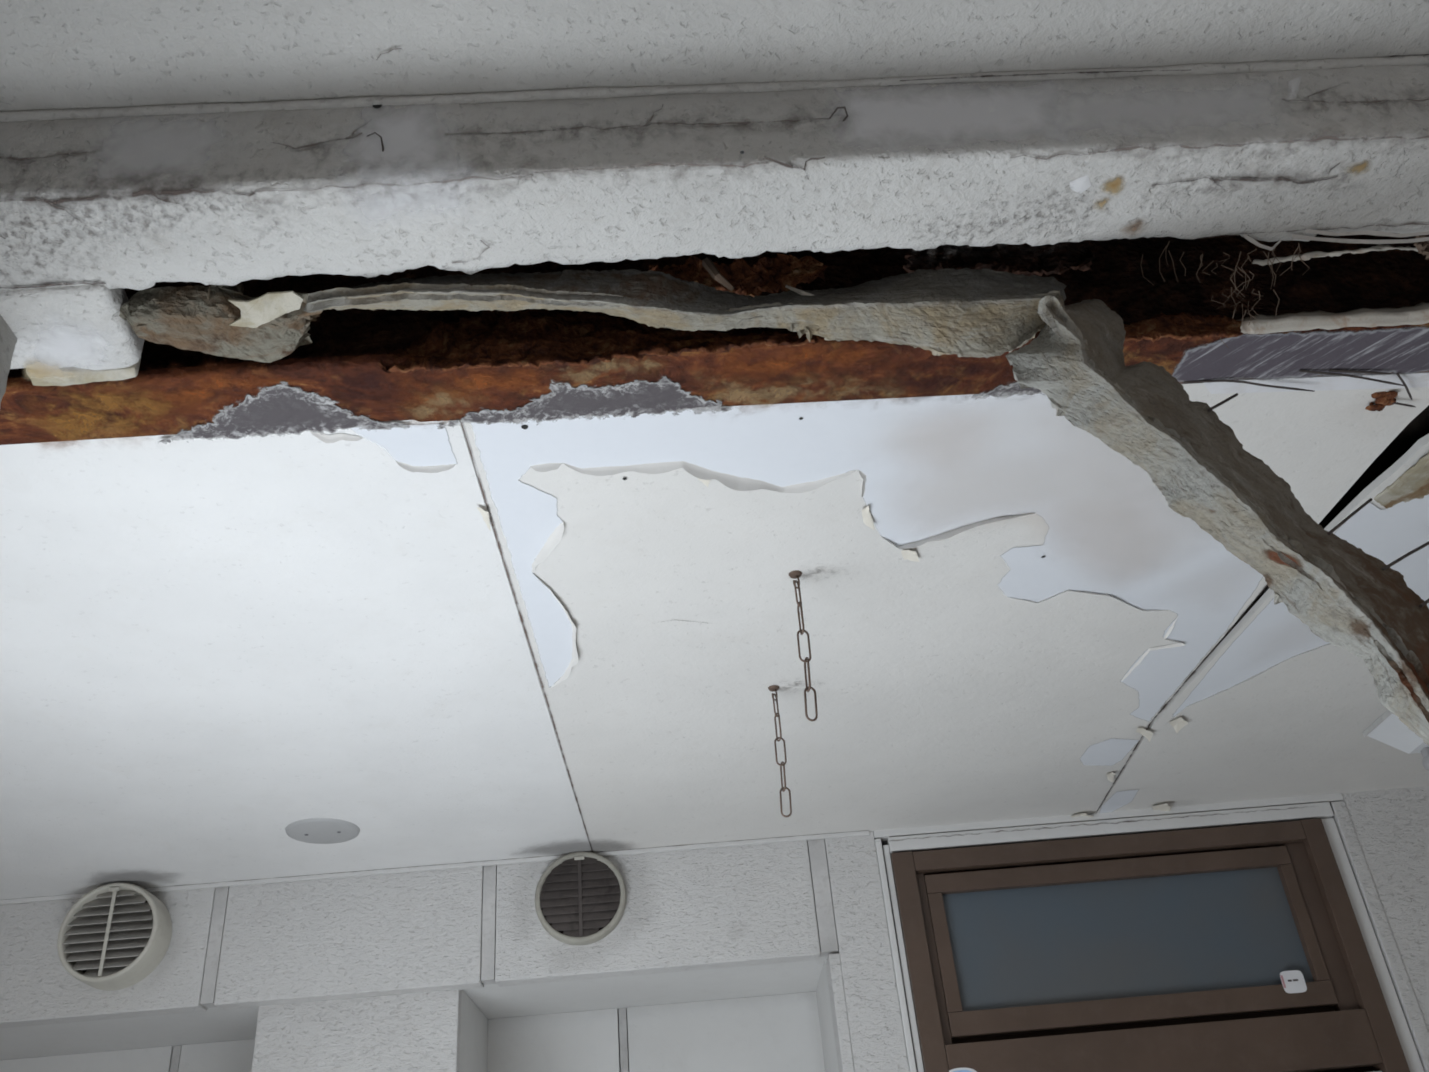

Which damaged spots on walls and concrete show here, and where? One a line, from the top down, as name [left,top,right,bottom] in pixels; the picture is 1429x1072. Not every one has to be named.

crack [0,152,86,160]
crack [282,128,362,149]
crack [432,157,825,183]
crack [446,106,829,135]
crack [0,183,396,211]
peeling [228,291,304,328]
spalling [25,358,141,386]
rust [376,309,864,415]
peeling [1172,327,1429,382]
rust [45,374,269,441]
peeling [1335,494,1429,608]
peeling [160,376,1331,782]